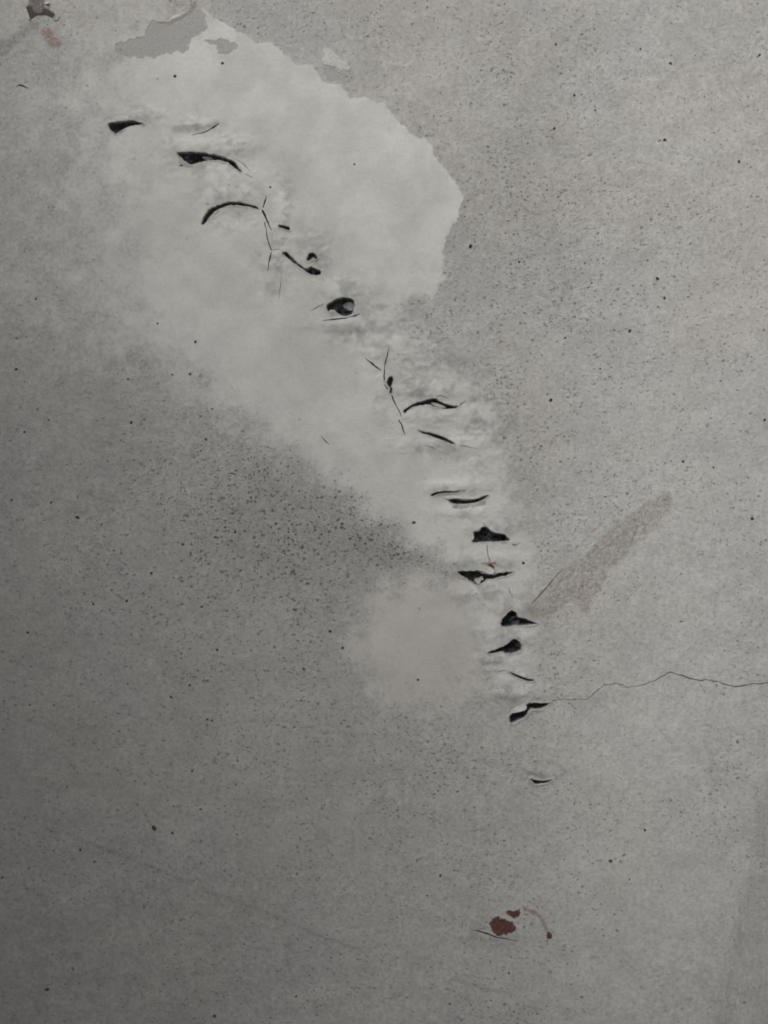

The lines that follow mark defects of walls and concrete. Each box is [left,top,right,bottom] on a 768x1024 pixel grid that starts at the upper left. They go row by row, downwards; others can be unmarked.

peeling [110,0,244,65]
crack [262,199,282,295]
crack [366,350,405,434]
crack [553,672,768,709]
corrosion [485,901,557,942]